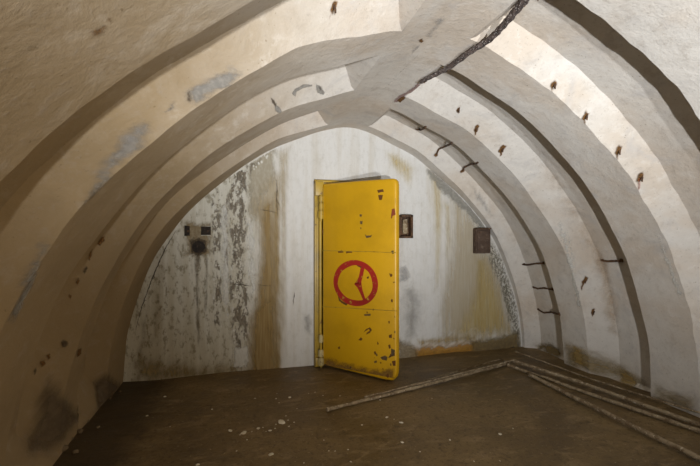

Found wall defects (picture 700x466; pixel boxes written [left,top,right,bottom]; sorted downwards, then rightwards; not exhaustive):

leakage [216,182,280,373]
leakage [428,170,520,351]
leakage [29,390,79,449]